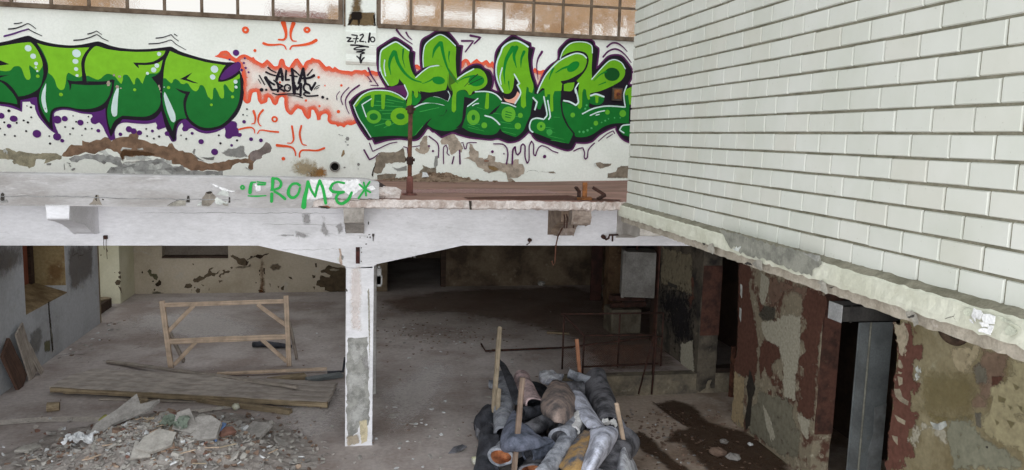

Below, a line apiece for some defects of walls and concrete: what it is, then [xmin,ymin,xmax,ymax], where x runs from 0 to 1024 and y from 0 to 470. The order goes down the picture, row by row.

flaking render [0,130,272,175]
flaking render [372,134,525,182]
flaking render [594,162,629,178]
flaking render [184,253,292,293]
flaking render [312,263,347,292]
flaking render [719,229,834,428]
peeling [963,308,1021,336]
peeling [346,289,370,446]
flaking render [866,310,948,470]
flaking render [951,345,1024,455]